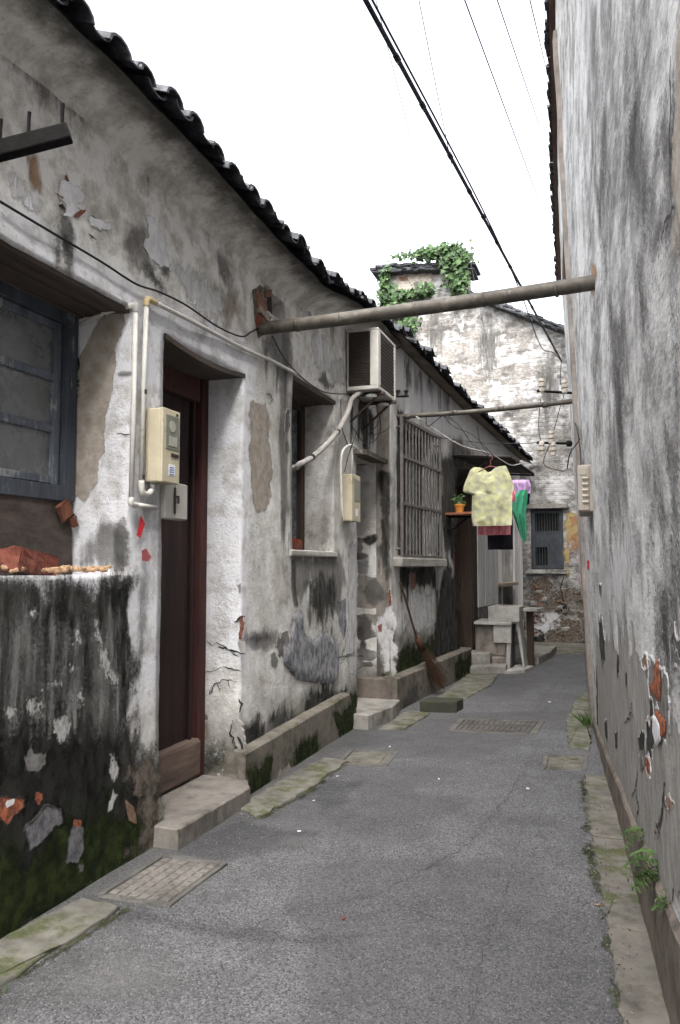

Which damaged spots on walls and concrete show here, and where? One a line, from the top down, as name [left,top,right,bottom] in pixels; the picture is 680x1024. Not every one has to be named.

rust [27,155,41,192]
peeling [55,175,111,240]
leakage [124,227,170,292]
spalling [252,285,272,338]
peeling [75,313,125,501]
peeling [376,571,433,676]
leakage [0,517,161,880]
crack [205,640,244,712]
peeling [530,502,680,903]
spalling [0,792,84,873]